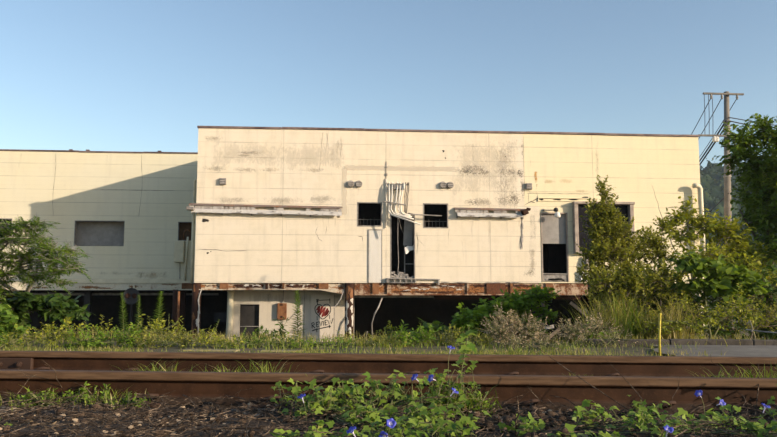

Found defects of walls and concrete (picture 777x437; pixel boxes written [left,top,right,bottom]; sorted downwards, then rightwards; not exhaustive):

rust [192,284,353,300]
rust [370,284,486,294]
rust [505,284,543,293]